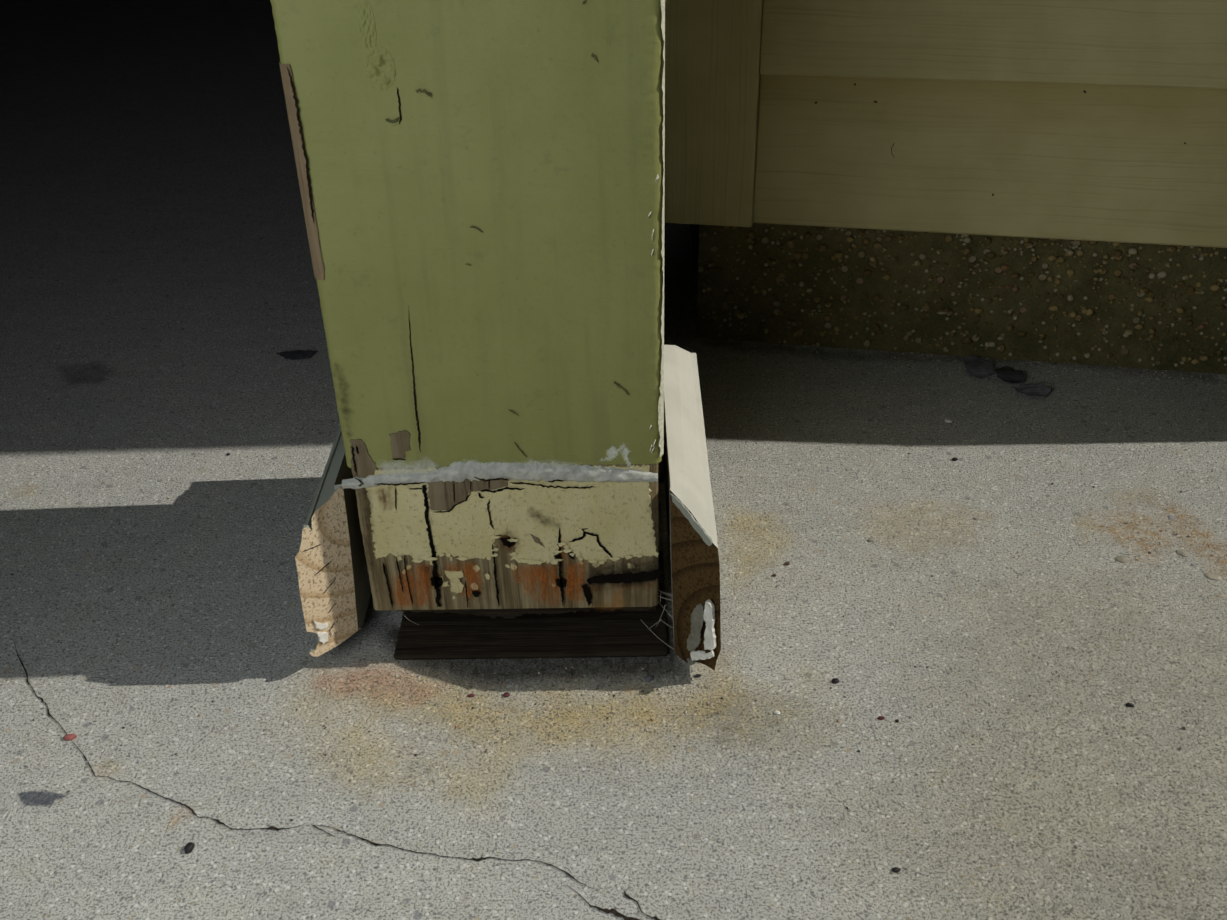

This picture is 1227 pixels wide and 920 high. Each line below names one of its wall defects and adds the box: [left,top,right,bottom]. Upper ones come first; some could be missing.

crack [408,307,421,452]
peeling [445,570,464,593]
peeling [427,479,508,513]
crack [355,477,593,608]
crack [14,643,660,920]